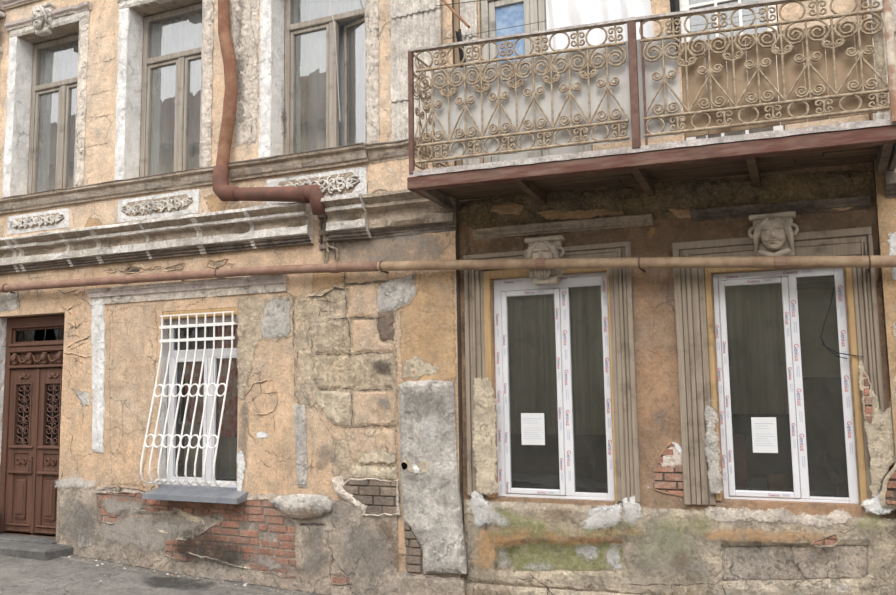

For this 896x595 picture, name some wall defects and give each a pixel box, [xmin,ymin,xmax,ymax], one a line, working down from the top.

peeling [458,170,876,229]
peeling [887,231,896,255]
crack [2,263,183,473]
peeling [94,304,300,578]
damp [177,533,243,565]
crack [243,217,394,468]
peeling [236,273,439,572]
peeling [471,377,499,528]
damp [575,546,619,565]
damp [584,502,638,530]
flaking render [648,441,691,498]
peeling [858,360,896,515]